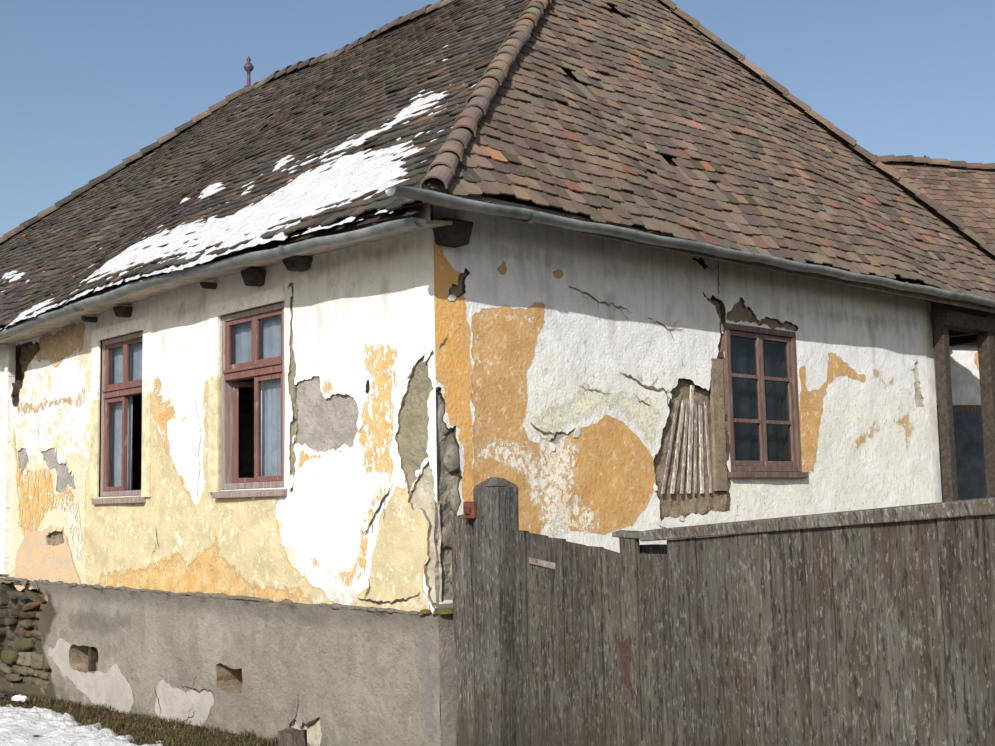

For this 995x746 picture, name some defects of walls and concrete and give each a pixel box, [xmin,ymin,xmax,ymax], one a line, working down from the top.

crack [569,286,684,339]
peeling [0,240,798,695]
peeling [799,353,879,473]
spalling [898,360,925,448]